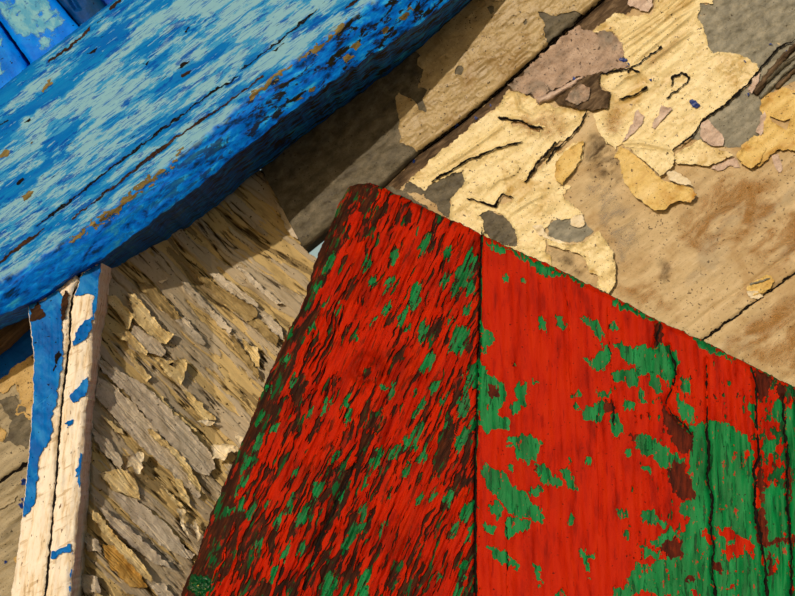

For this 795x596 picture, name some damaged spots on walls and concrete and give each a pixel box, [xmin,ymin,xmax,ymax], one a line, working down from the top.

peeling [0,0,64,50]
spalling [48,17,103,62]
spalling [69,147,184,243]
crack [0,10,317,263]
peeling [275,200,298,239]
spalling [249,18,347,101]
peeling [313,0,795,596]
crack [44,286,76,596]
peeling [0,260,294,596]
peeling [253,320,579,596]